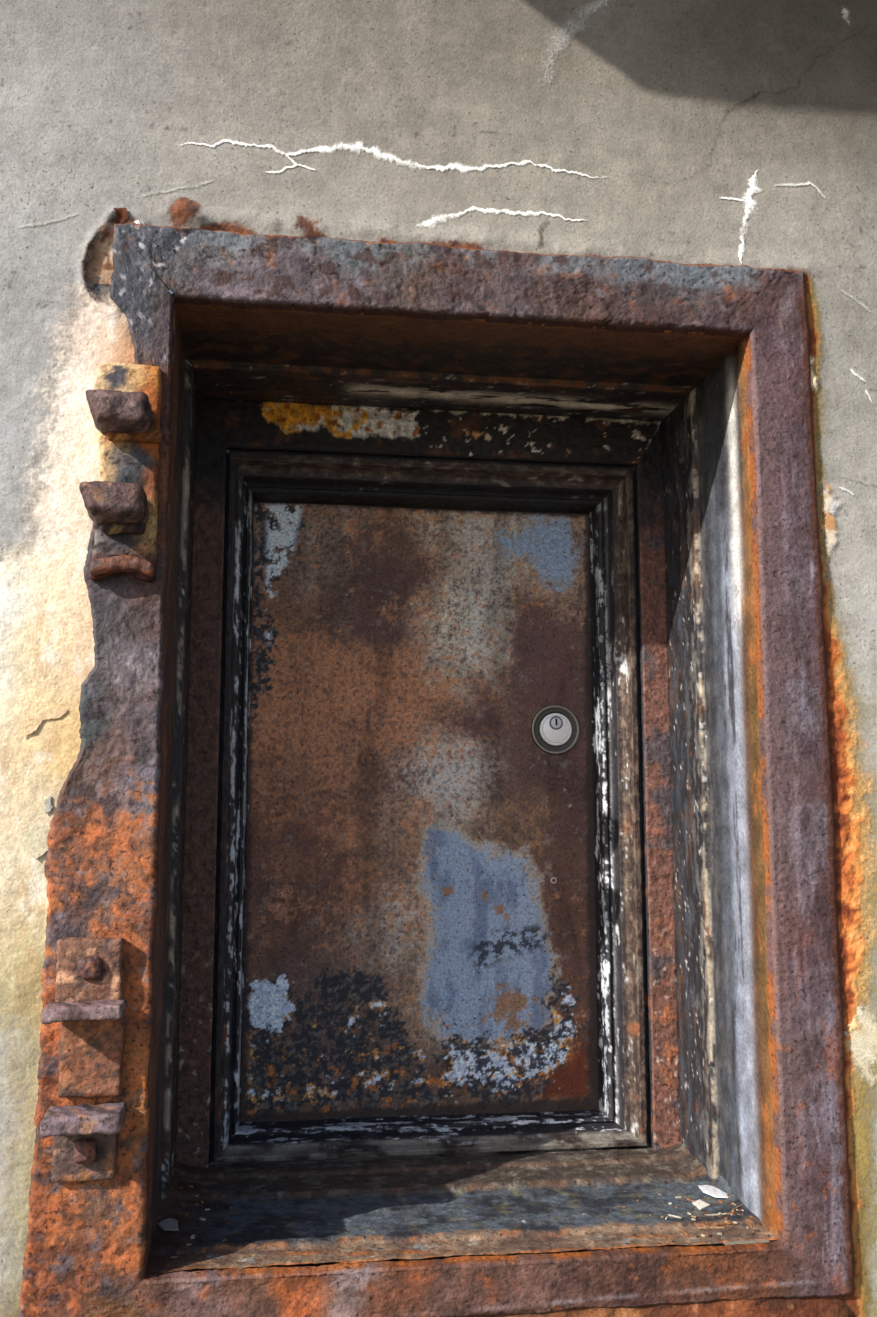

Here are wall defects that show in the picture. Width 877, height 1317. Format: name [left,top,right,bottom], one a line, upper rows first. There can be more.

rust [168,197,255,234]
rust [294,216,326,240]
rust [417,240,483,249]